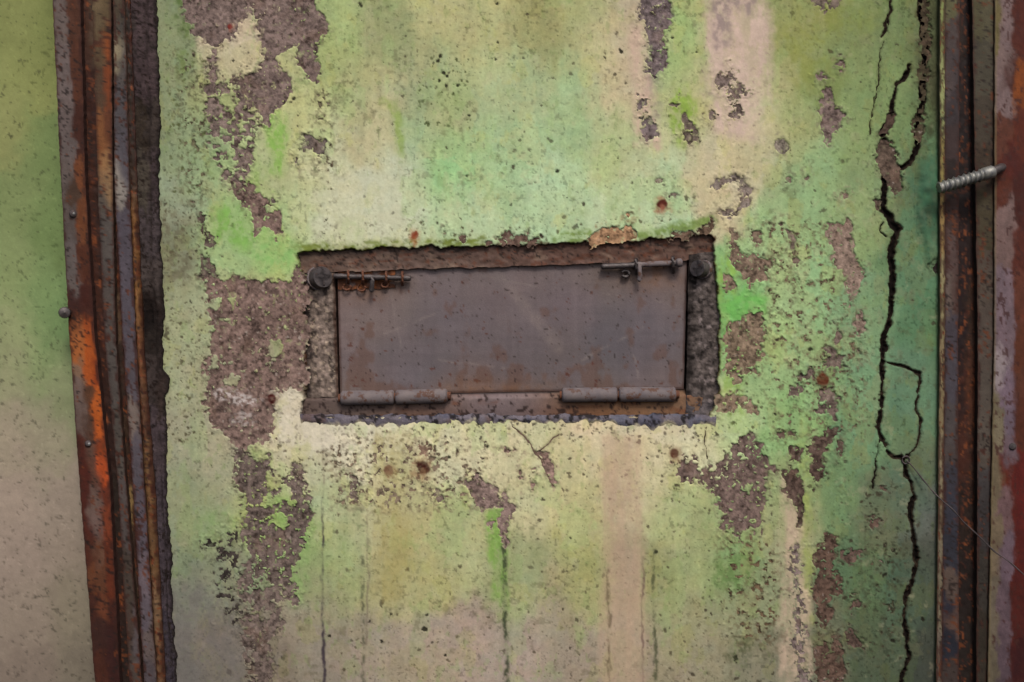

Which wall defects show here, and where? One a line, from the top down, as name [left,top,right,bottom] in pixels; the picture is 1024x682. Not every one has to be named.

peeling [637,0,673,79]
peeling [811,0,841,14]
peeling [180,0,334,242]
peeling [636,94,659,142]
peeling [669,93,699,145]
peeling [709,60,749,120]
peeling [815,54,846,147]
crack [869,0,930,682]
peeling [181,163,316,682]
peeling [667,174,866,640]
peeling [323,430,516,548]
peeling [518,451,557,491]